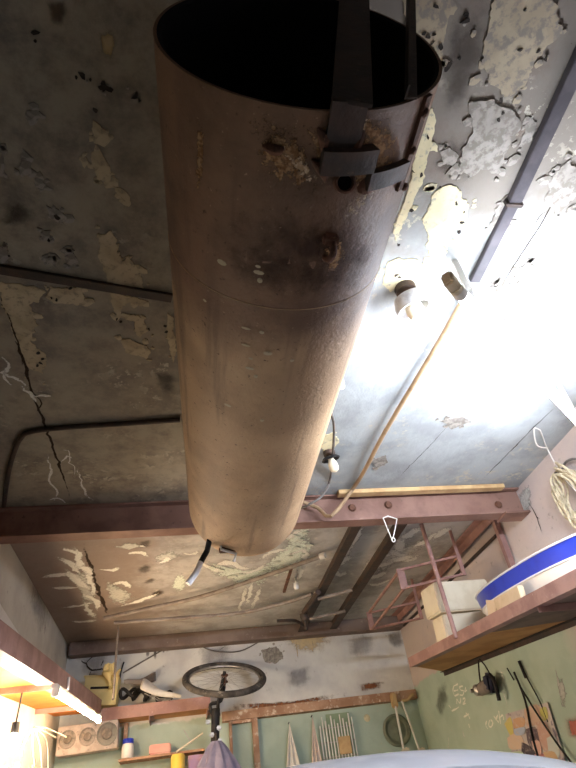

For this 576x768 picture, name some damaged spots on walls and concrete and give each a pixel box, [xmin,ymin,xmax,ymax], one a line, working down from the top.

peeling [87,108,131,207]
peeling [375,0,567,292]
peeling [536,153,576,217]
peeling [0,281,95,385]
peeling [95,225,155,361]
crack [1,298,70,496]
peeling [435,416,471,429]
crack [83,549,108,613]
peeling [259,643,285,664]